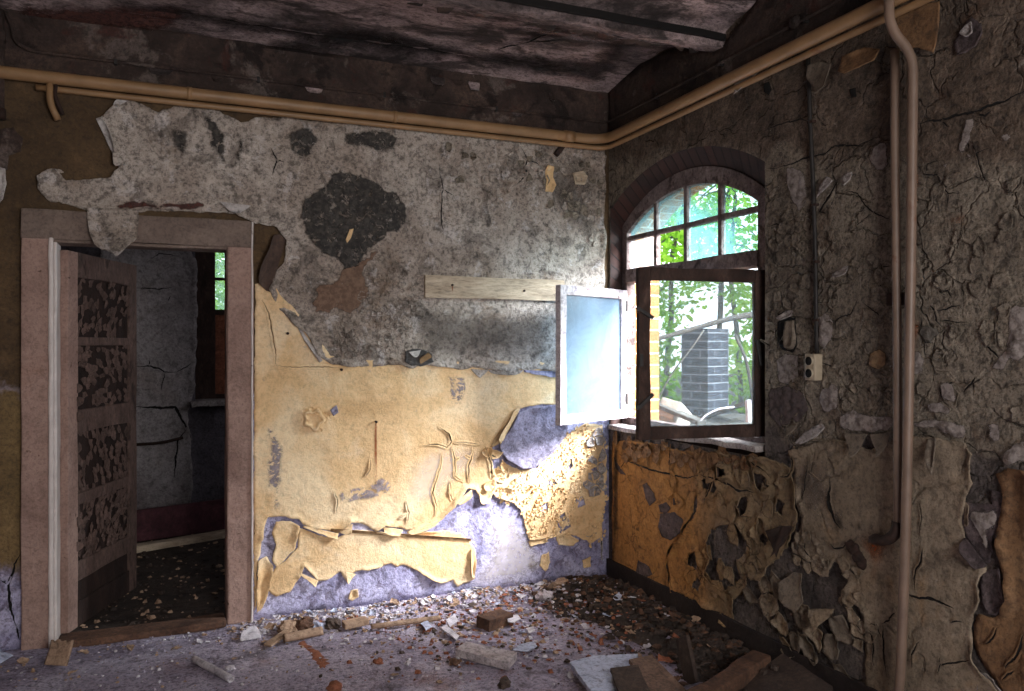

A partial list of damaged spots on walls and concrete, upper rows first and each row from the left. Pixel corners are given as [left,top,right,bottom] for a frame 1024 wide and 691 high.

damp [301,171,407,314]
crack [765,133,891,256]
crack [834,262,890,330]
crack [919,284,1002,358]
crack [918,90,1024,206]
crack [136,360,192,478]
peeling [37,99,900,691]
crack [938,377,976,398]
peeling [904,346,1024,691]